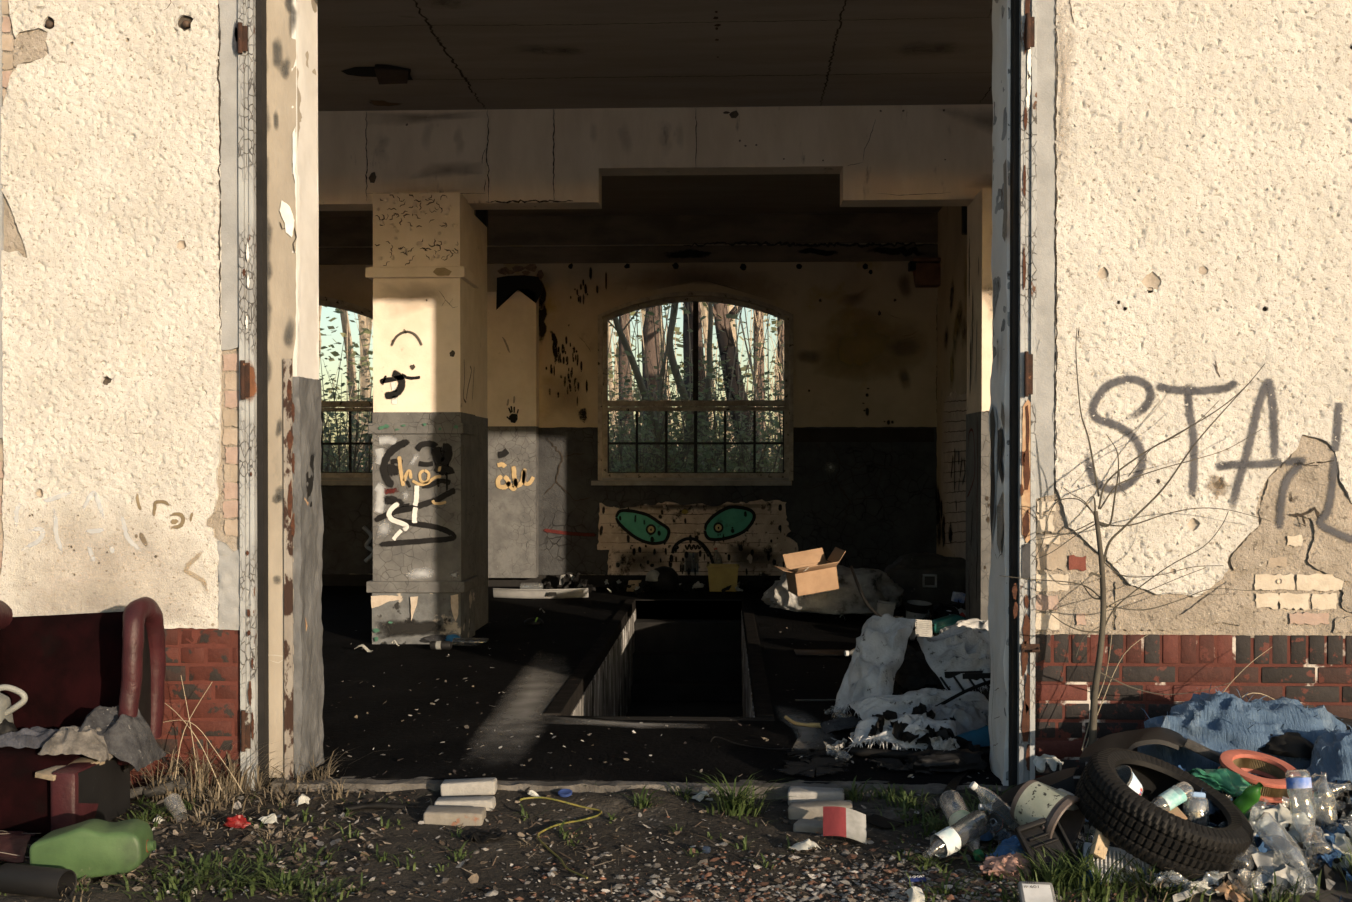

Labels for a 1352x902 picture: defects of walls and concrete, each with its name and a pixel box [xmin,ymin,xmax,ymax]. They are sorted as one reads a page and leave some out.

flaking render [2,0,49,101]
crack [362,0,992,203]
flaking render [4,196,27,258]
flaking render [279,201,294,237]
flaking render [207,348,240,551]
flaking render [1035,435,1352,639]